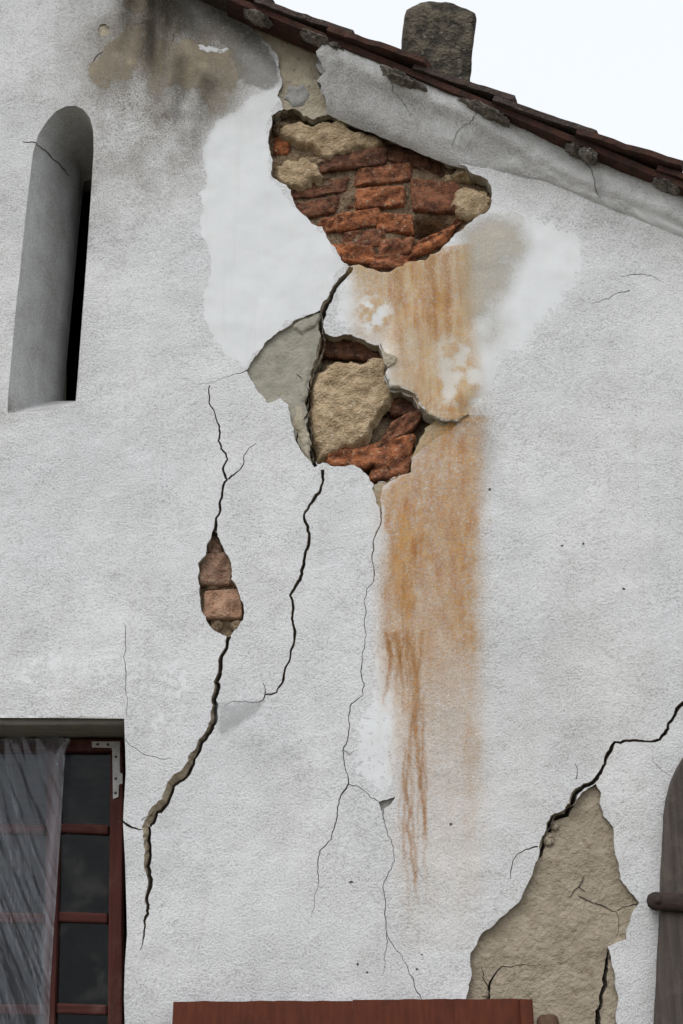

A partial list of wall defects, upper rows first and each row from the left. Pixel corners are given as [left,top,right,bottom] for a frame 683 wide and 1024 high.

crack [23,141,70,176]
leakage [100,0,233,114]
spalling [175,0,492,272]
spalling [247,310,457,512]
spalling [198,530,244,640]
crack [119,267,351,950]
corrosion [356,246,479,824]
crack [311,511,421,998]
peeling [466,784,639,1024]
crack [510,701,683,879]